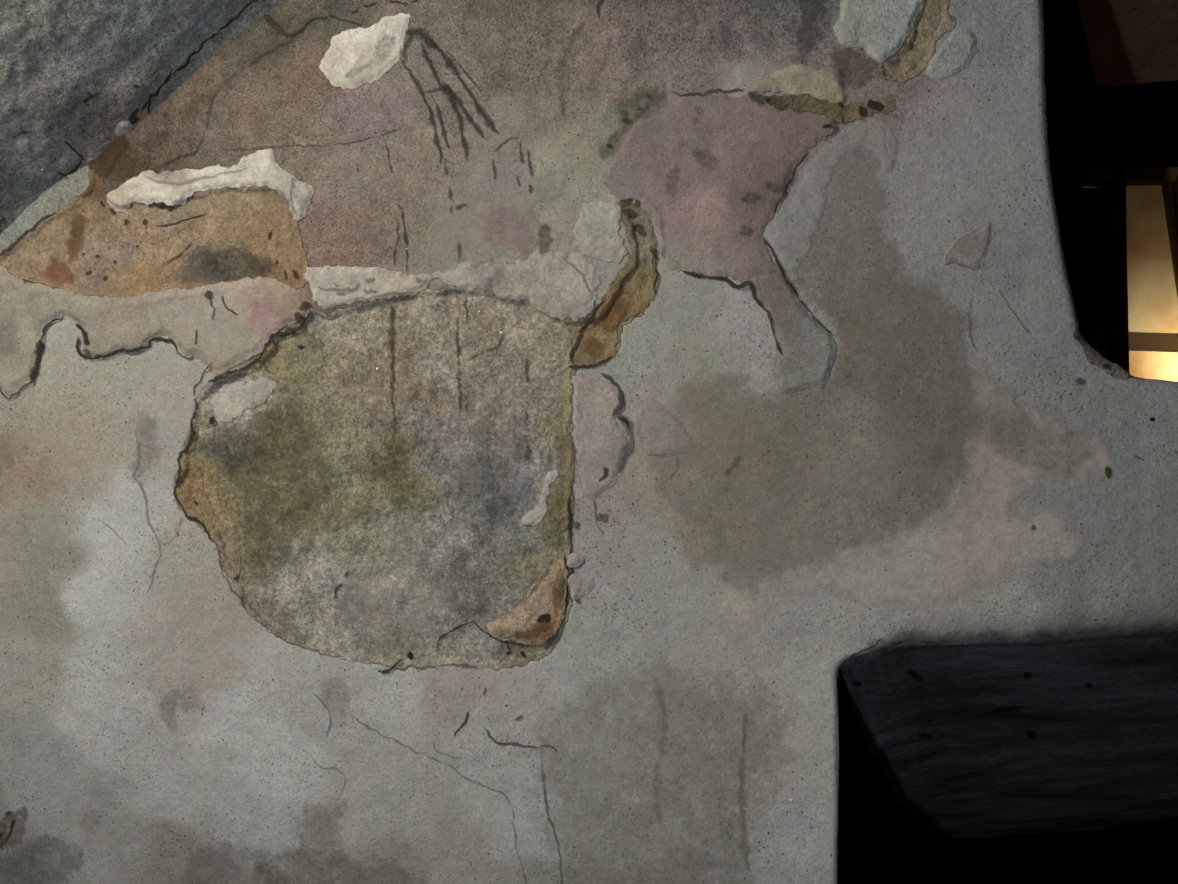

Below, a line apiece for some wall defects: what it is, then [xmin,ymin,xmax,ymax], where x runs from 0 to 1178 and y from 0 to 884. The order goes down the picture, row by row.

crack [12,92,99,176]
crack [129,0,418,166]
flaking render [877,0,956,83]
flaking render [0,88,896,671]
leakage [655,118,1111,637]
crack [313,687,562,883]